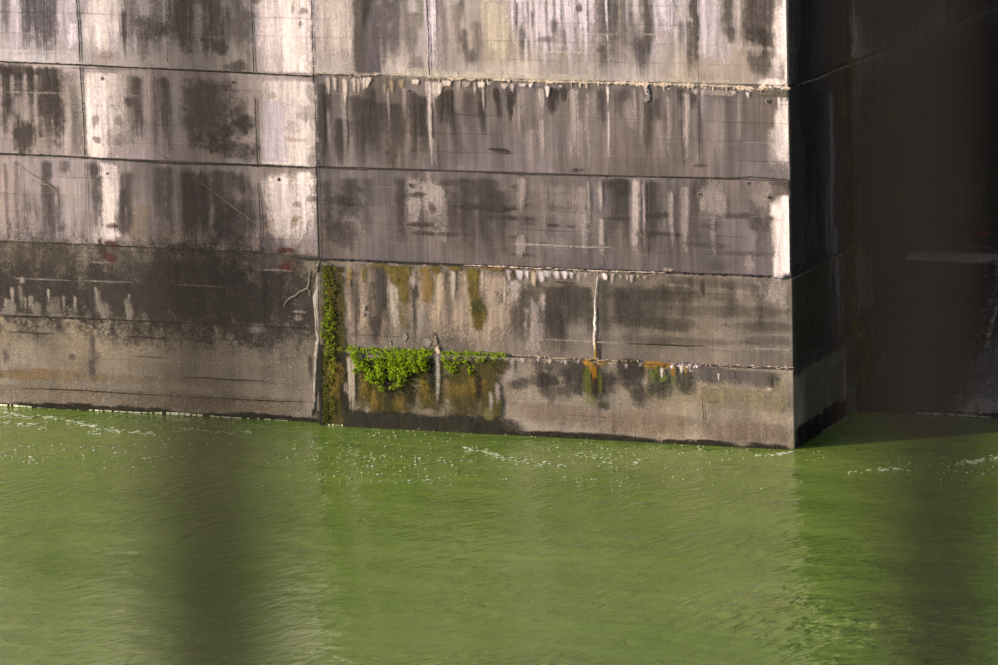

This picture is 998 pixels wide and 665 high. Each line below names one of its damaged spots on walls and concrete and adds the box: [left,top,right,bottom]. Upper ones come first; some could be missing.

leakage [12,0,143,53]
leakage [0,63,155,374]
leakage [245,0,891,447]
leakage [15,386,103,403]